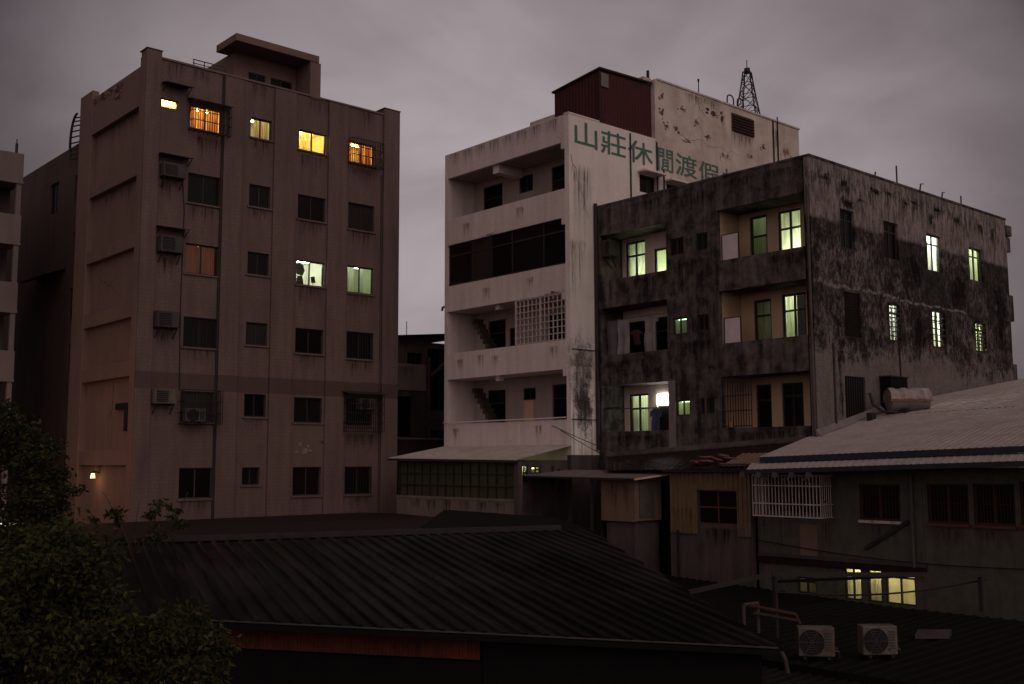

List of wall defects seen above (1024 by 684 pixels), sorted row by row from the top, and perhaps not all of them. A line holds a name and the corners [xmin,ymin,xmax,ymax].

mould [841,180,891,209]
water stain [814,271,967,354]
water stain [571,345,593,436]